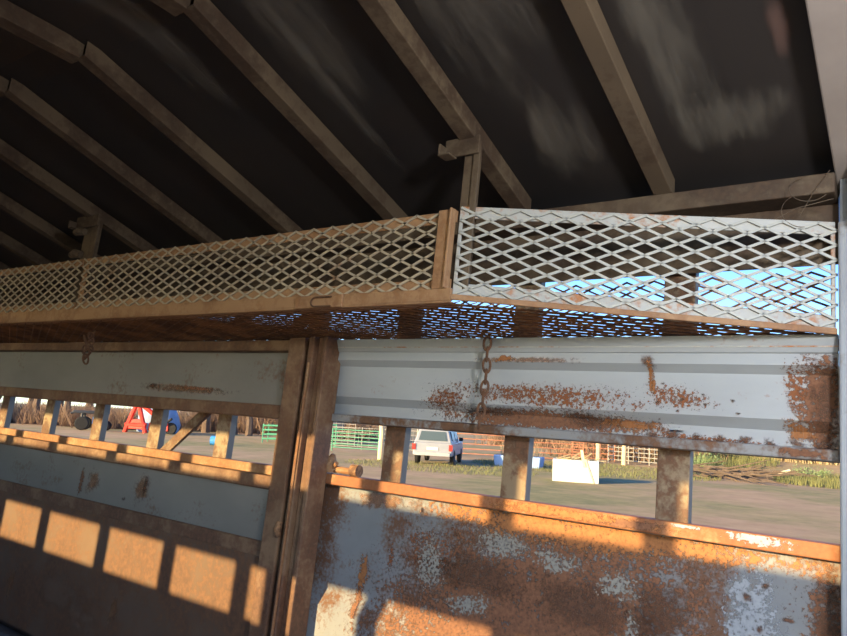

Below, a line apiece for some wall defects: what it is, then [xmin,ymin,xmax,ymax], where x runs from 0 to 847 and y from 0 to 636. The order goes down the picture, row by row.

corrosion [149,384,220,394]
corrosion [421,354,840,460]
corrosion [343,494,841,636]